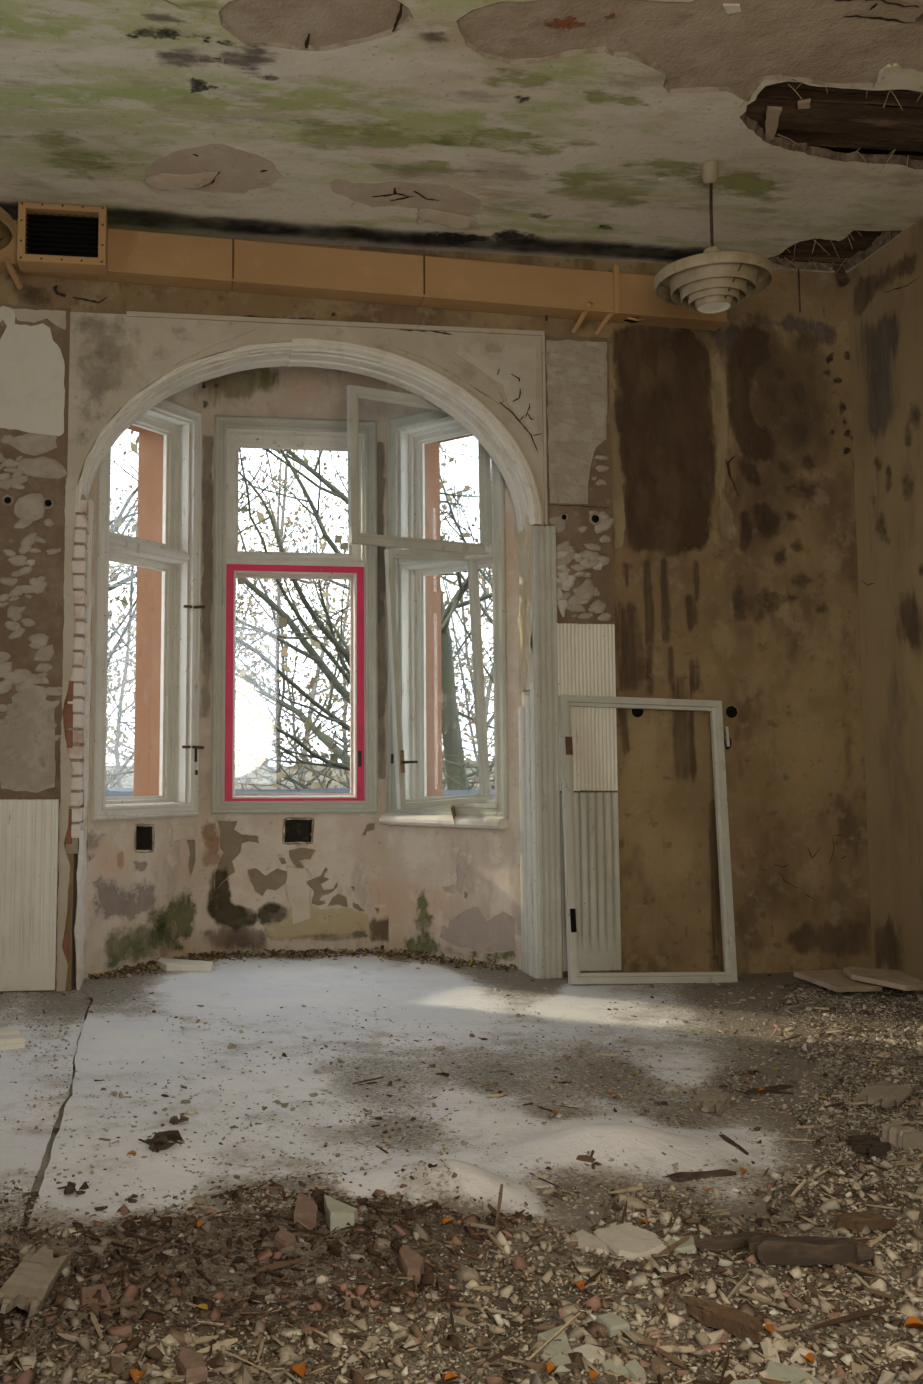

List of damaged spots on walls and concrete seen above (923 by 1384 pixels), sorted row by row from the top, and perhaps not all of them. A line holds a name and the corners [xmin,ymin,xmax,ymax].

mould [127,14,278,93]
spalling [219,0,414,51]
spalling [457,0,923,169]
peeling [145,144,281,194]
peeling [330,178,481,230]
leakage [426,213,551,240]
leakage [867,314,898,437]
leakage [608,316,849,779]
leakage [900,597,918,647]
peeling [214,819,380,940]
peeling [439,862,517,954]
leakage [710,806,720,967]